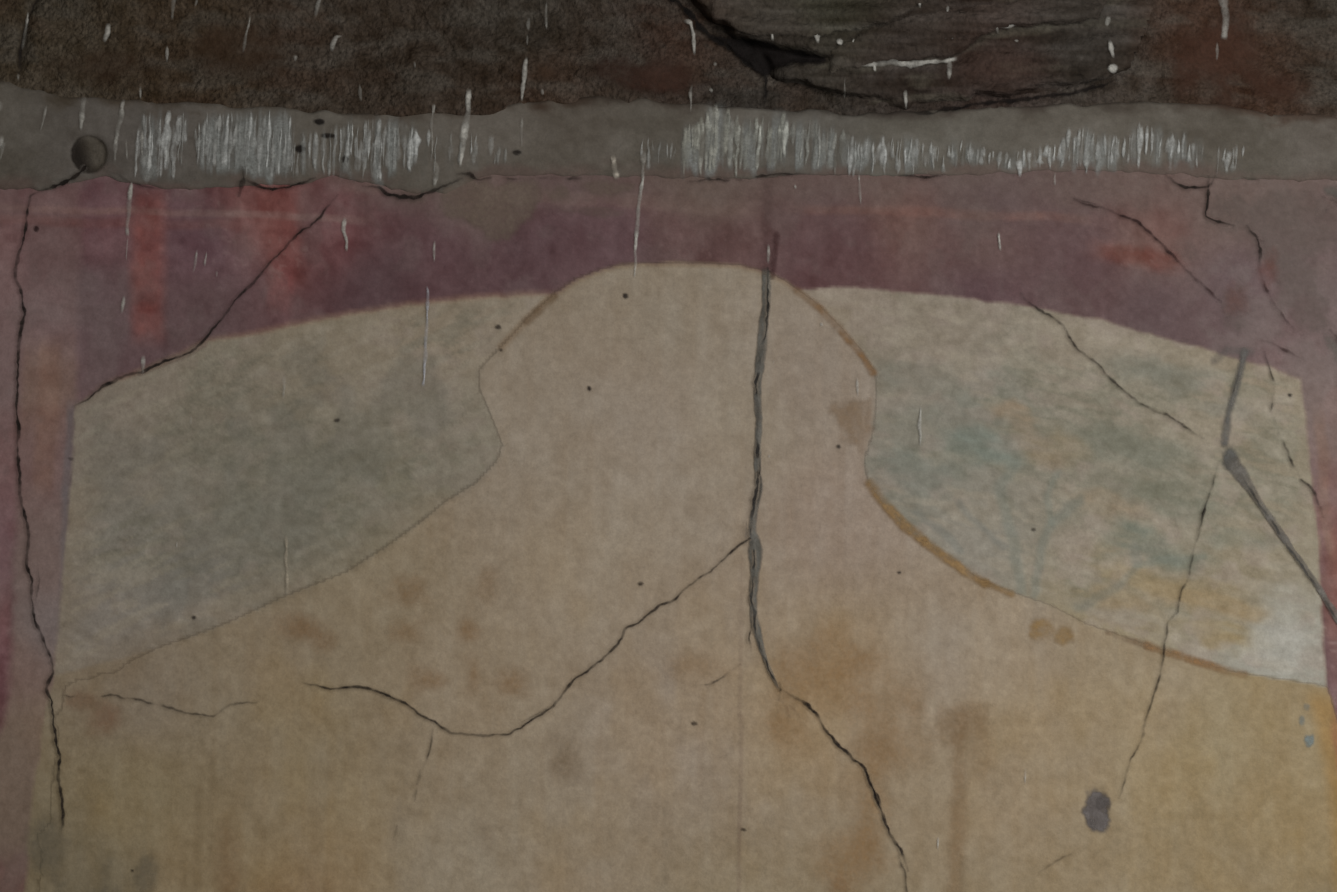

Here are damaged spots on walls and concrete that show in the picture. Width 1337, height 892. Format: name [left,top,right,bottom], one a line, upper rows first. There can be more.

leakage [135,112,291,173]
crack [240,176,305,191]
leakage [309,121,437,184]
leakage [682,109,912,173]
leakage [1008,127,1191,174]
crack [1088,204,1176,258]
crack [1177,183,1262,253]
crack [87,208,326,400]
crack [1035,306,1188,429]
crack [1202,348,1337,623]
crack [493,271,907,890]
crack [319,685,444,756]